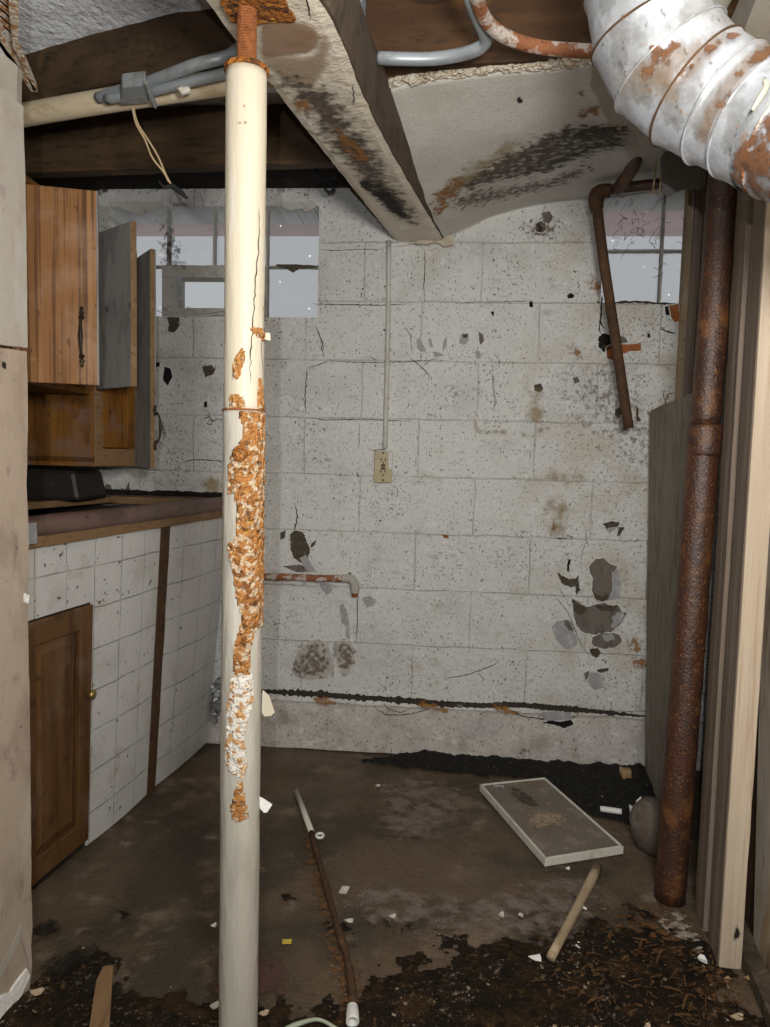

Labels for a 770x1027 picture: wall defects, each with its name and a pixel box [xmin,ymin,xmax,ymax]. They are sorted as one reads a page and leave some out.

leakage [262,22,419,226]
leakage [449,124,626,210]
spalling [534,211,553,234]
spalling [156,362,173,386]
rust [232,445,248,462]
peeling [280,530,335,595]
leakage [292,639,356,678]
peeling [292,603,357,680]
peeling [551,557,627,690]